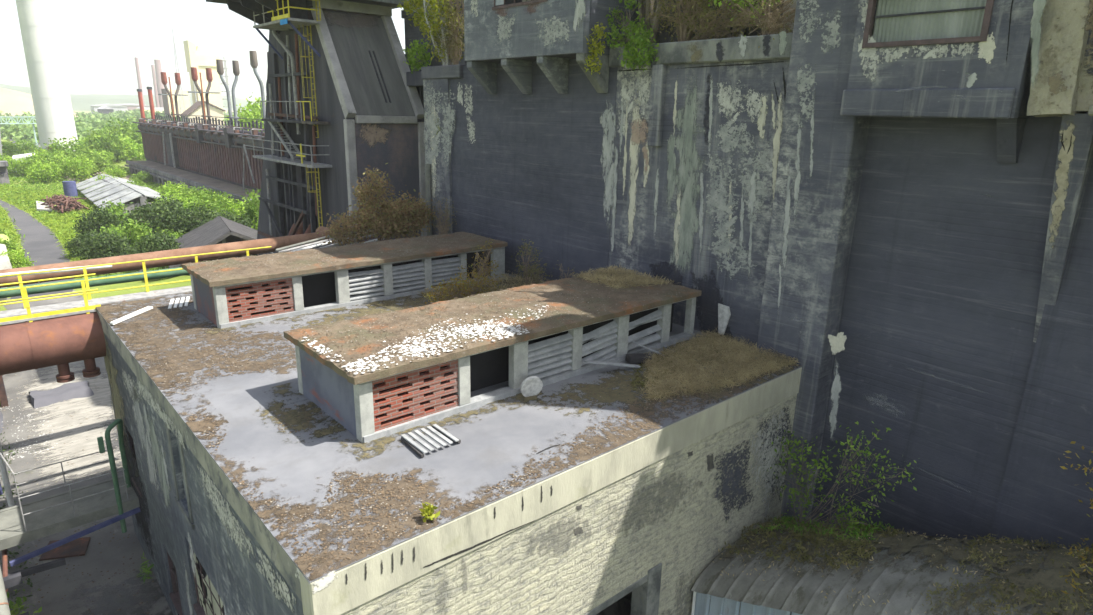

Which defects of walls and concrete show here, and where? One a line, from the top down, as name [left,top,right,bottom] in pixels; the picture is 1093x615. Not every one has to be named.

damp [716,42,724,62]
damp [738,35,748,57]
damp [762,31,787,56]
peeling [798,0,842,54]
peeling [858,0,996,82]
spalling [1085,0,1093,93]
peeling [797,63,817,128]
damp [600,74,756,338]
damp [757,94,815,308]
spalling [828,332,847,438]